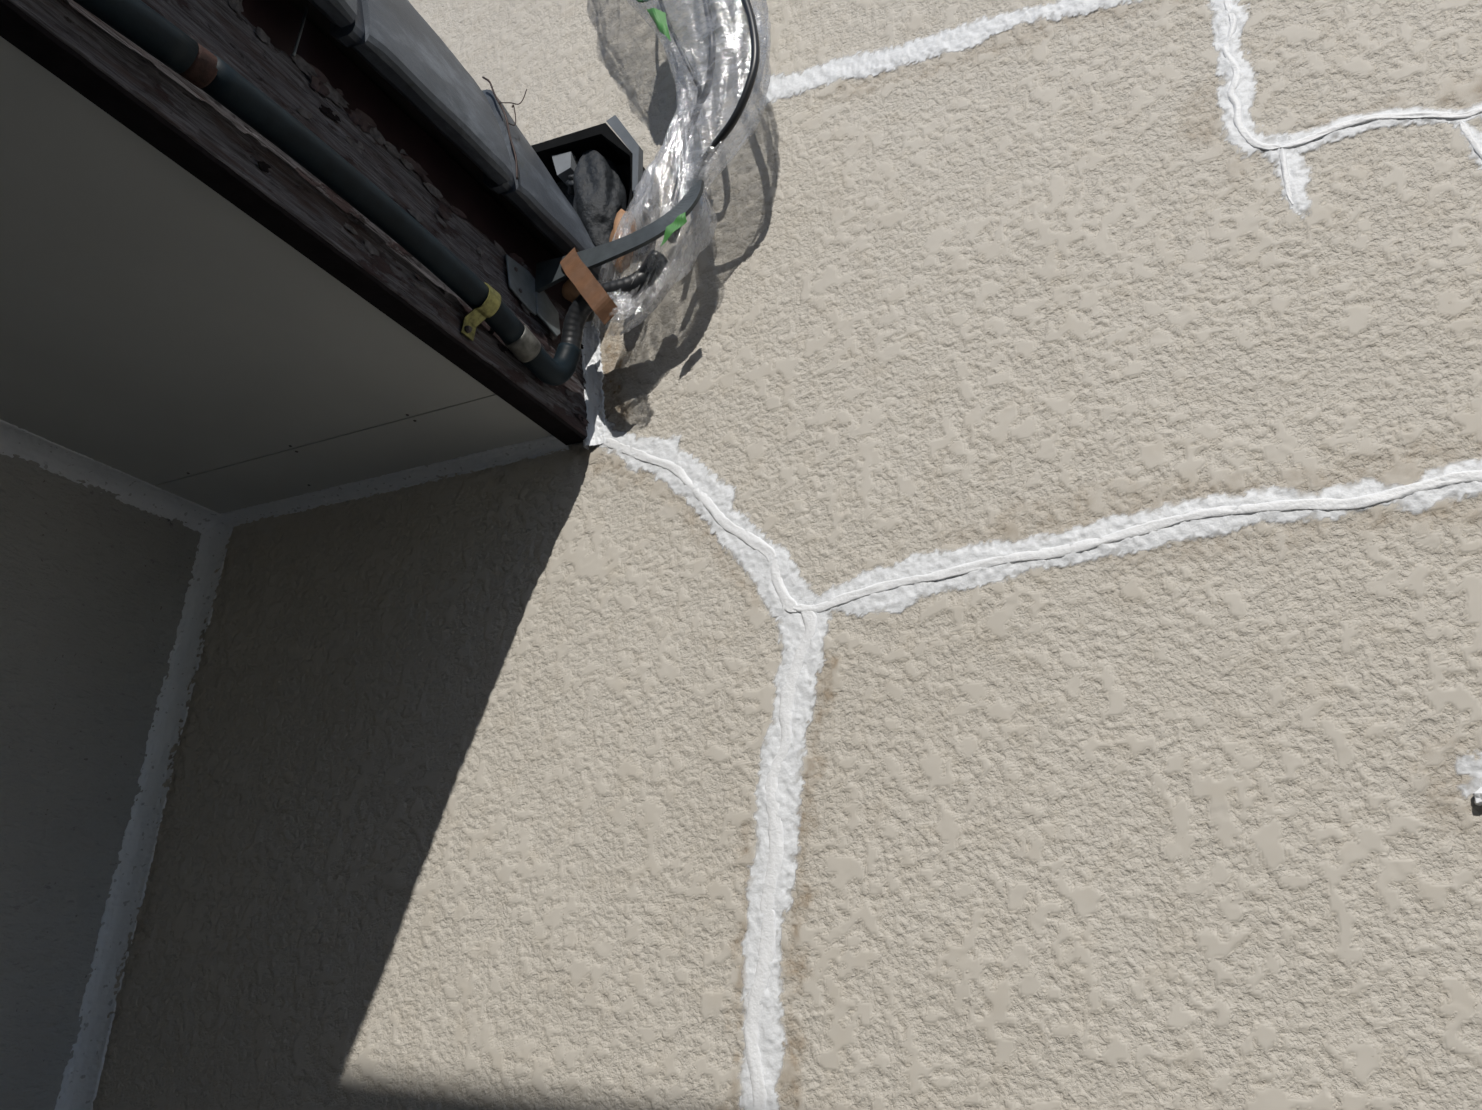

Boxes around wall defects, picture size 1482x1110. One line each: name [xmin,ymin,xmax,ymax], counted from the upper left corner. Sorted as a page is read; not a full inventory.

peeling [290,54,467,228]
crack [762,0,1142,105]
crack [1208,0,1482,218]
crack [596,419,1482,1110]